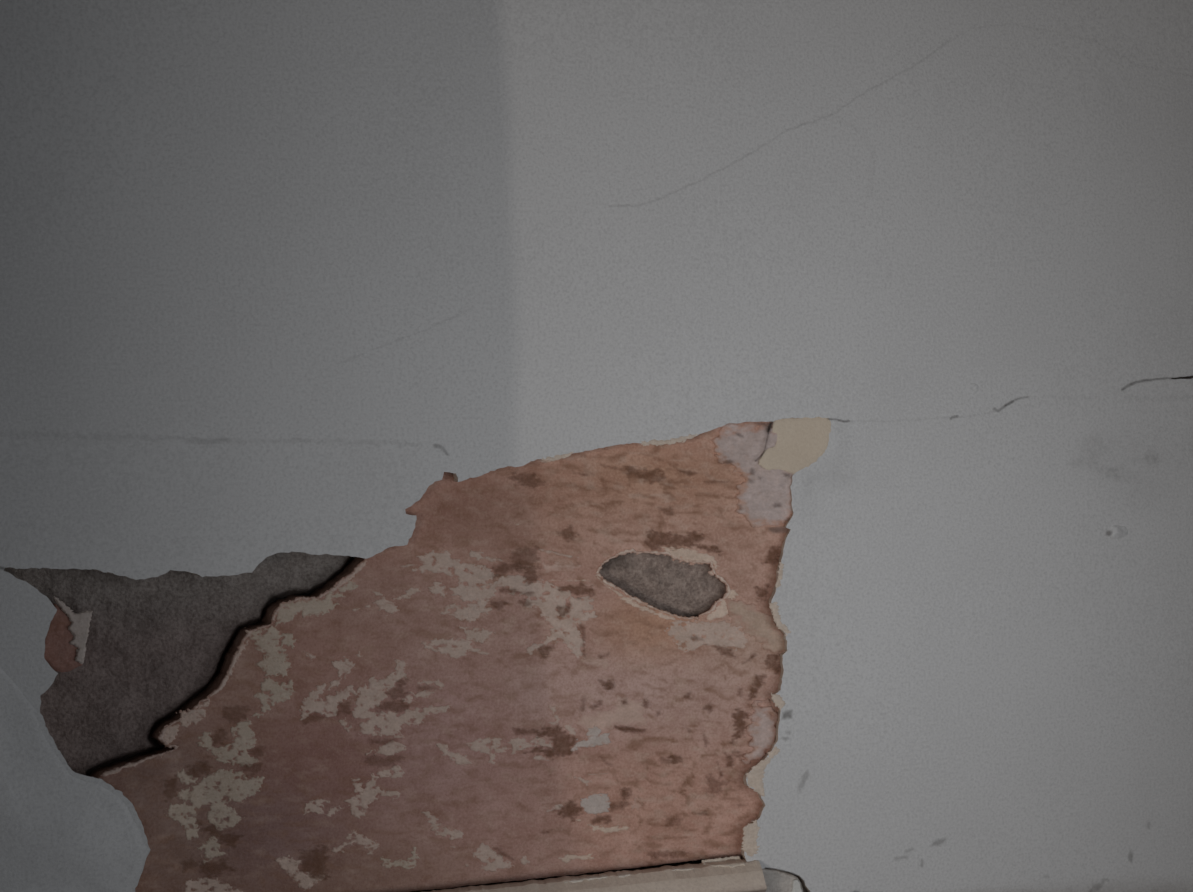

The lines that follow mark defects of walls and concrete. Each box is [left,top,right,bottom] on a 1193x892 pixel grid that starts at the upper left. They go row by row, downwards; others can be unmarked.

flaking render [4,419,794,892]
spalling [762,868,810,892]